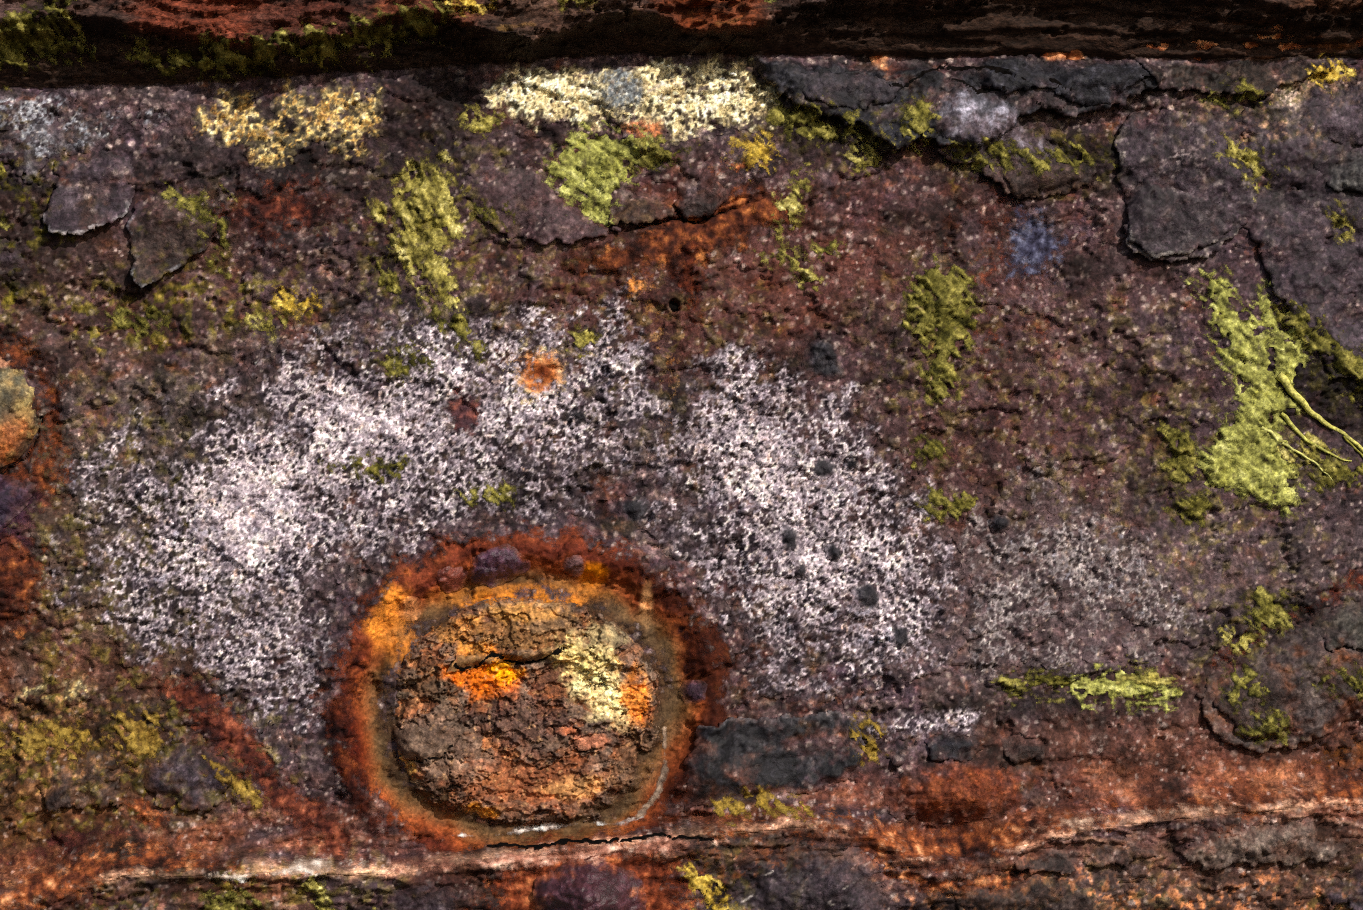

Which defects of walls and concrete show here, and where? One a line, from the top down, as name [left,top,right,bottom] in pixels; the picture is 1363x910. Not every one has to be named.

corrosion [142,520,771,910]
corrosion [1150,749,1363,817]
crack [473,832,714,851]
corrosion [793,798,1131,893]